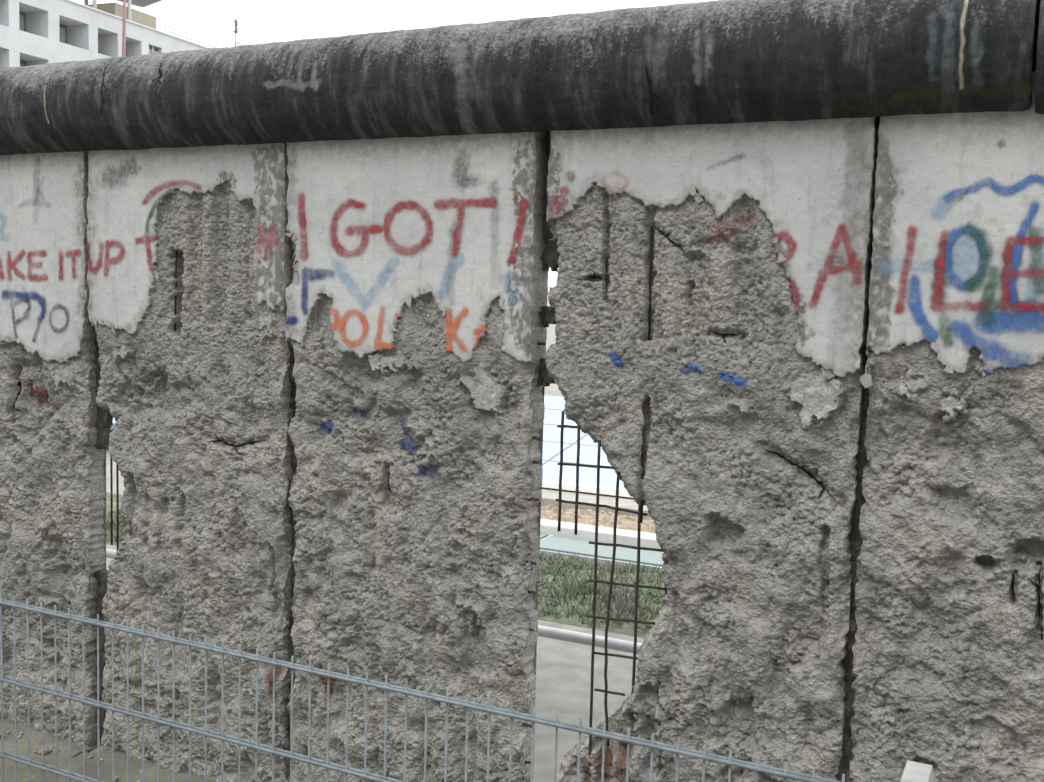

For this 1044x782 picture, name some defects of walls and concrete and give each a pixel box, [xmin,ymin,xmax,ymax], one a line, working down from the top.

crack [13,370,22,423]
crack [207,433,267,455]
spalling [0,136,544,782]
spalling [537,150,1044,782]
crack [767,450,842,505]